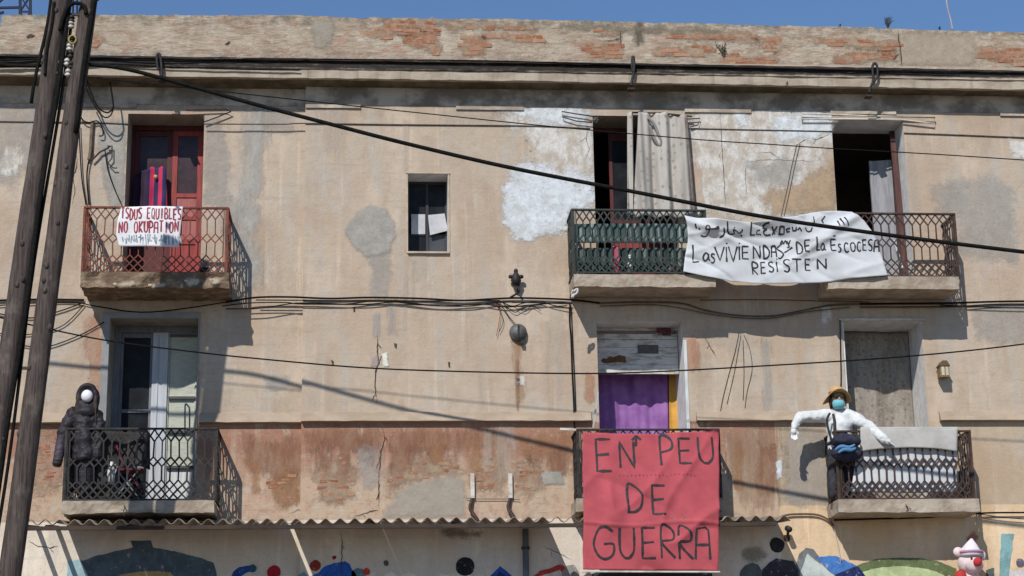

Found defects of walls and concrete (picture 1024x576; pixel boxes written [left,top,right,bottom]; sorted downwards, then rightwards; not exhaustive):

flaking render [363,18,546,57]
flaking render [574,29,624,59]
flaking render [653,30,785,64]
flaking render [814,37,904,64]
flaking render [975,47,1024,67]
peeling [497,107,595,241]
crack [372,336,381,400]
flaking render [266,451,544,509]
crack [341,432,387,570]